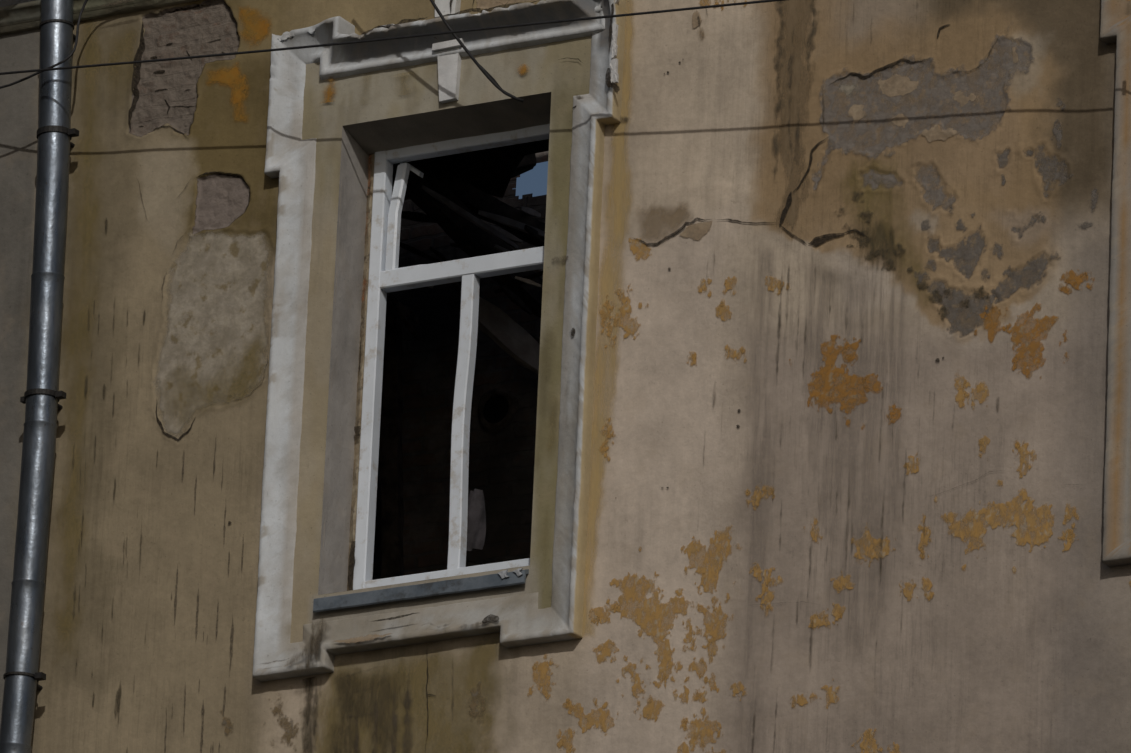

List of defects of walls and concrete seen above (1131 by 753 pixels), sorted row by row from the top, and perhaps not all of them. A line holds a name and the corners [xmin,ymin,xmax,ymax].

flaking render [128,0,240,137]
spalling [605,0,620,92]
crack [634,98,868,246]
damp [773,0,816,229]
flaking render [812,35,1033,190]
flaking render [156,171,268,441]
flaking render [917,166,1067,378]
peeling [807,334,883,430]
peeling [941,442,1079,570]
damp [267,619,495,753]
peeling [557,698,618,753]
peeling [590,525,746,753]